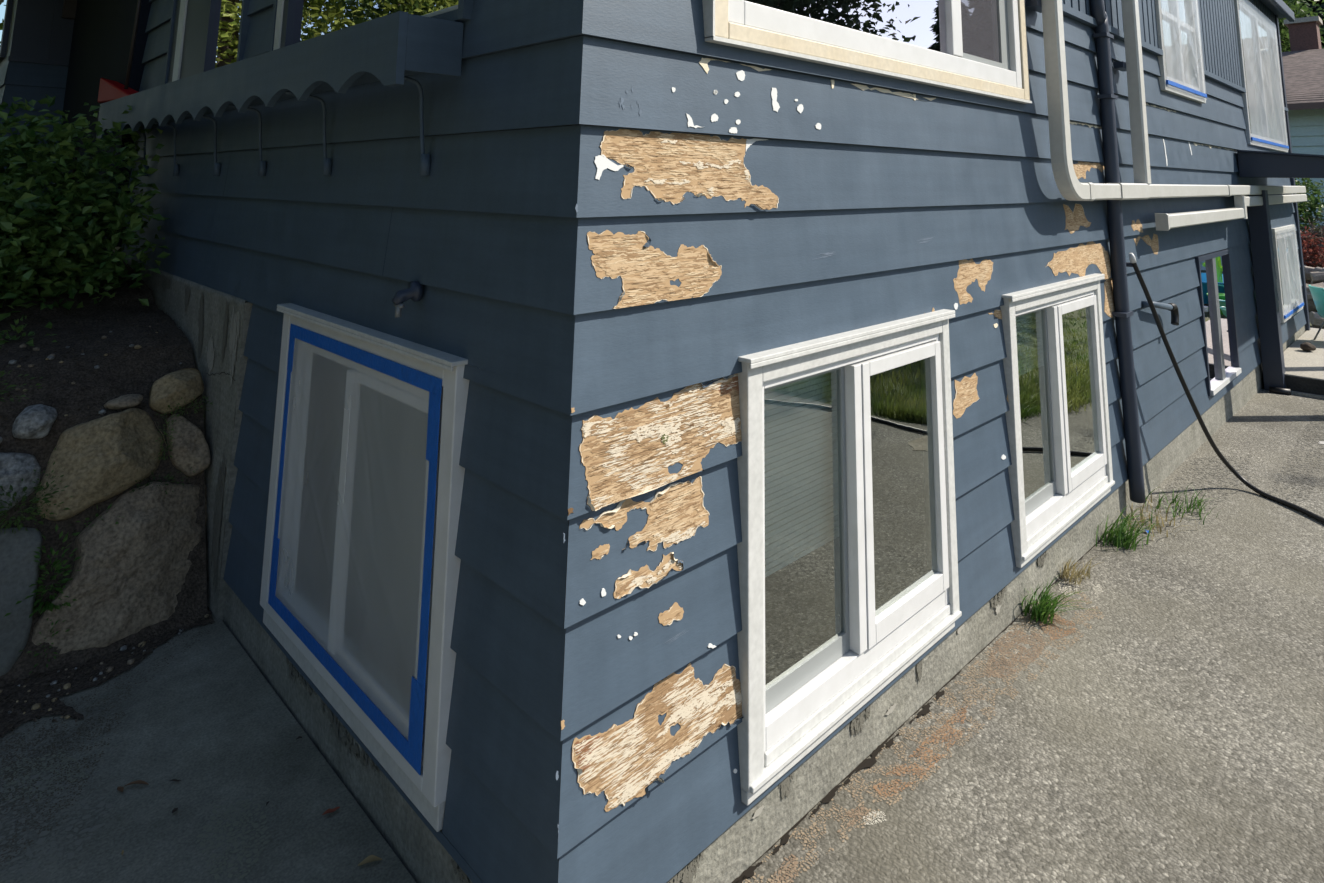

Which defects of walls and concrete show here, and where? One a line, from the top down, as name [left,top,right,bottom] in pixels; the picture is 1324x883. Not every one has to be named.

peeling [594,113,779,210]
peeling [587,230,722,309]
peeling [953,259,993,310]
peeling [1047,204,1115,318]
peeling [1131,219,1159,254]
peeling [953,373,980,419]
peeling [563,373,742,599]
peeling [561,663,744,812]